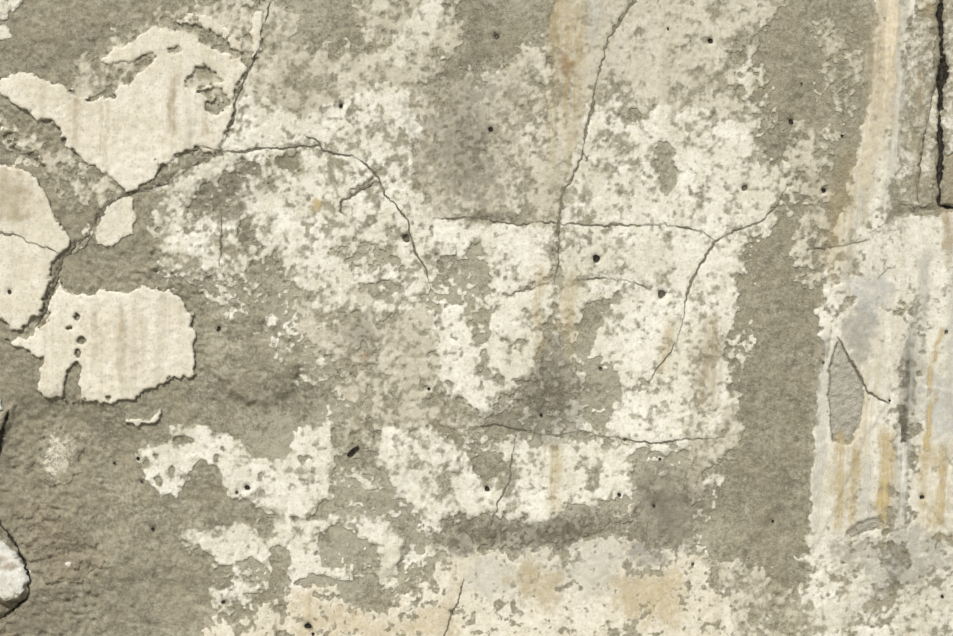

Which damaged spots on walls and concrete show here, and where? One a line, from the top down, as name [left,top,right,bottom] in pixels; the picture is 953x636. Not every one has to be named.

crack [0,0,431,328]
peeling [0,0,795,539]
crack [433,0,787,381]
peeling [779,0,953,562]
crack [911,0,953,211]
crack [0,410,9,452]
crack [0,522,31,619]
spalling [0,503,107,636]
peeling [178,499,953,636]